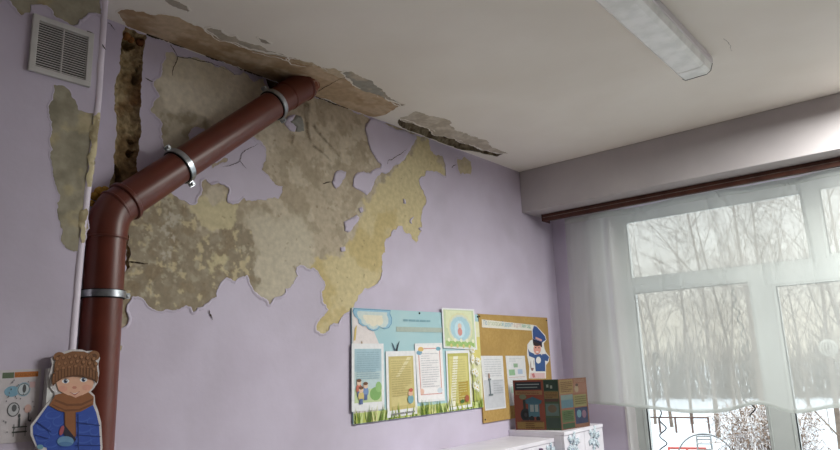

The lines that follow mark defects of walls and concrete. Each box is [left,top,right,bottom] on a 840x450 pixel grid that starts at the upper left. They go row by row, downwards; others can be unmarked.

crack [146,34,265,78]
peeling [46,84,100,253]
peeling [109,0,508,336]